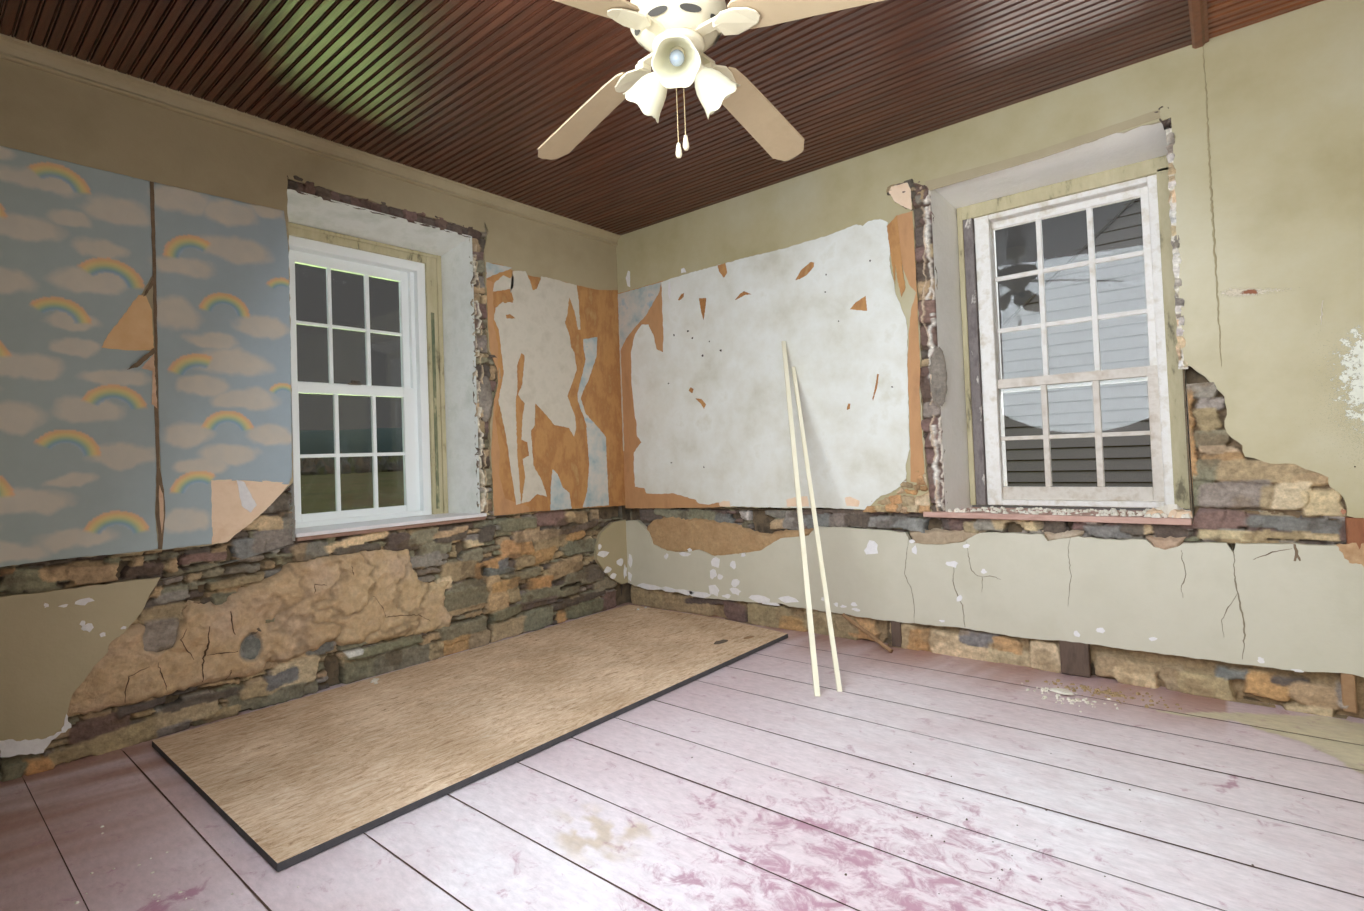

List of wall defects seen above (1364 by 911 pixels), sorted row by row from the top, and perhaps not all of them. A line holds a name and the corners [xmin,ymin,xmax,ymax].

flaking render [0,106,1364,782]
crack [1221,544,1301,659]